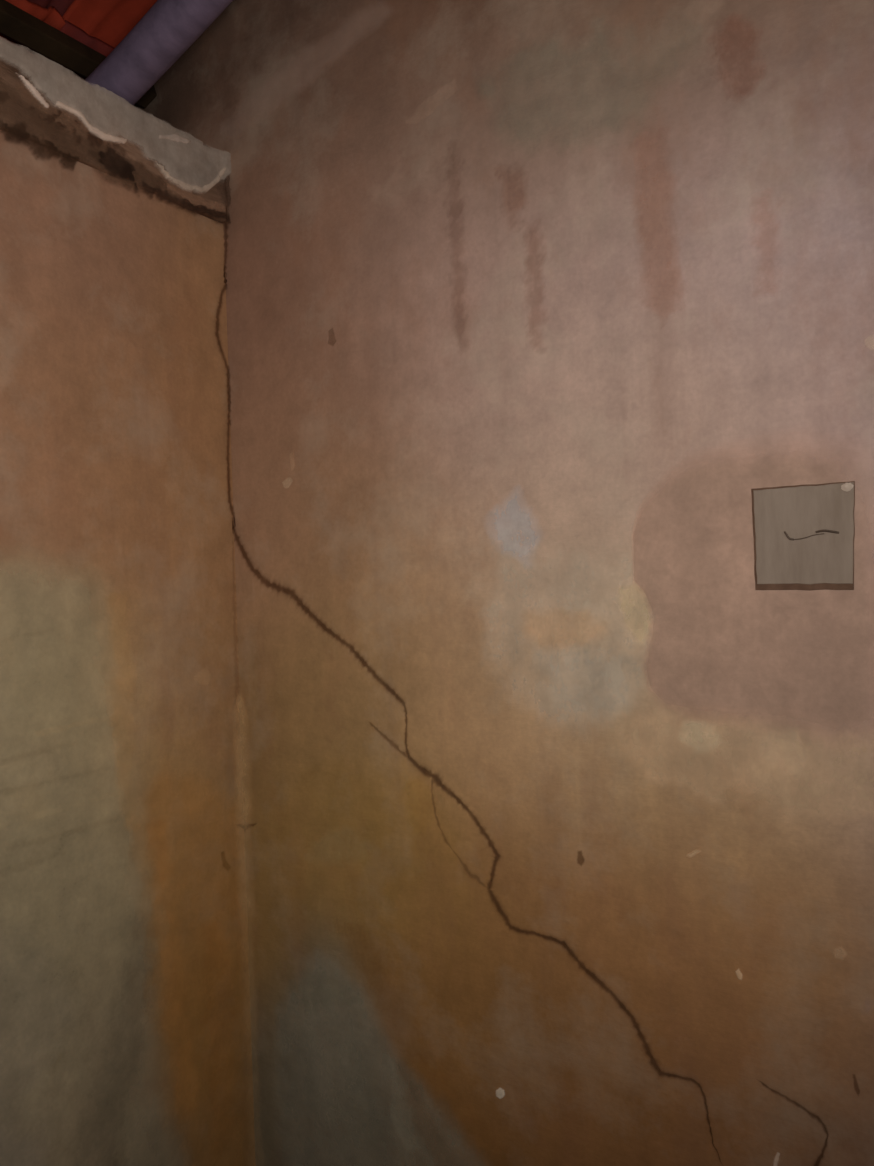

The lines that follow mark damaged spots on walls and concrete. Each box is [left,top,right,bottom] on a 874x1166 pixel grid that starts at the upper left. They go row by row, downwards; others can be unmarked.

flaking render [0,37,231,223]
crack [216,190,720,1159]
crack [761,1082,828,1166]